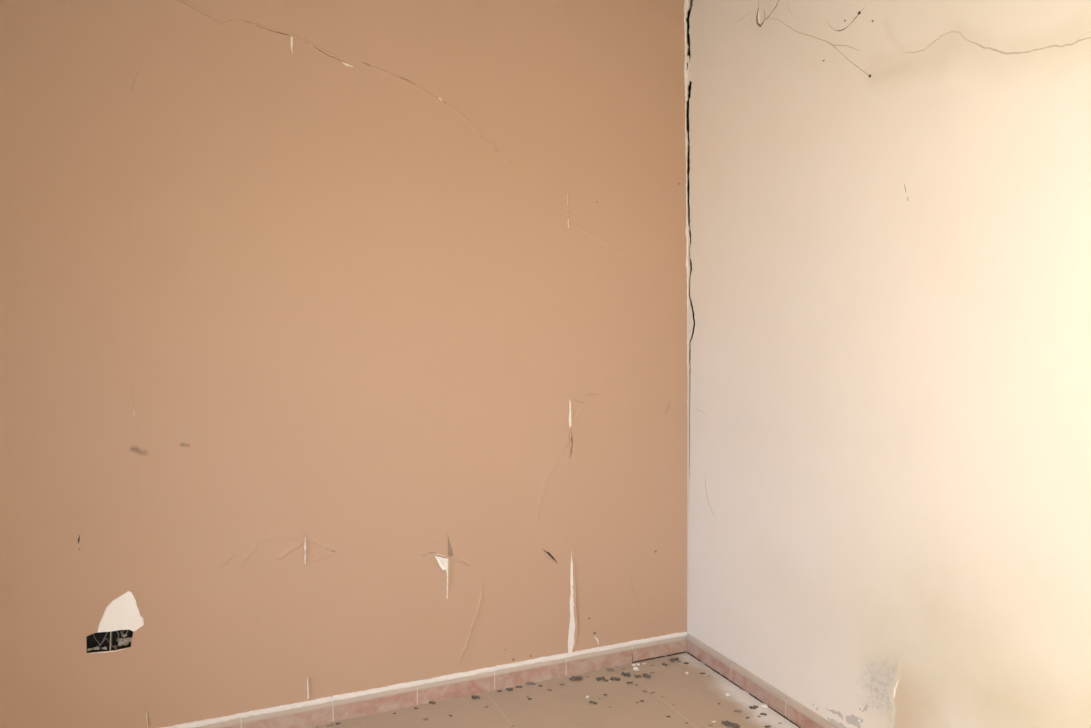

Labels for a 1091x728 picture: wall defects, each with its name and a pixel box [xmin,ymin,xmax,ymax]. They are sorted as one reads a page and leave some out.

crack [733,0,871,77]
crack [906,31,1091,55]
crack [681,0,696,652]
flaking render [98,591,144,632]
flaking render [437,554,448,599]
flaking render [890,656,953,728]